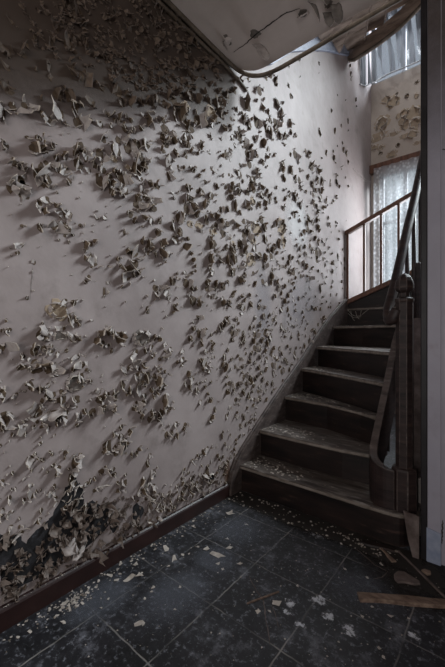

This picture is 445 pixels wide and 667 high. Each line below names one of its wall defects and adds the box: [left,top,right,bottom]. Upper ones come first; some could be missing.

crack [234,9,297,52]
peeling [371,80,421,158]
peeling [0,0,350,603]